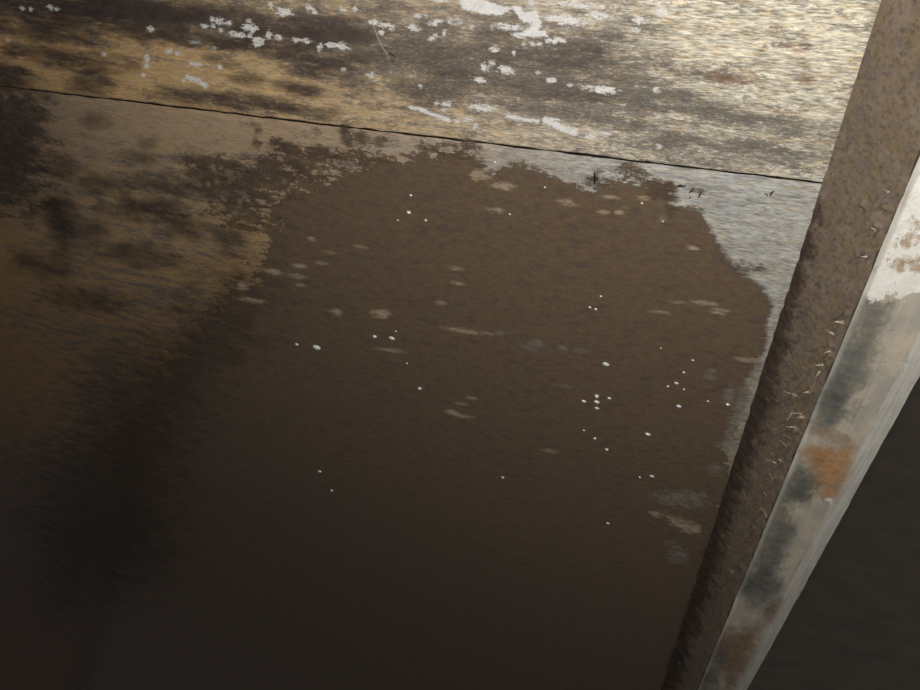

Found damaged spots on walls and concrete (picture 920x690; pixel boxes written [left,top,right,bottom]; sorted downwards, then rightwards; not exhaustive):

water stain [0,67,65,215]
water stain [0,0,372,96]
water stain [166,88,297,113]
water stain [339,124,366,147]
water stain [63,137,774,690]
water stain [661,0,920,690]